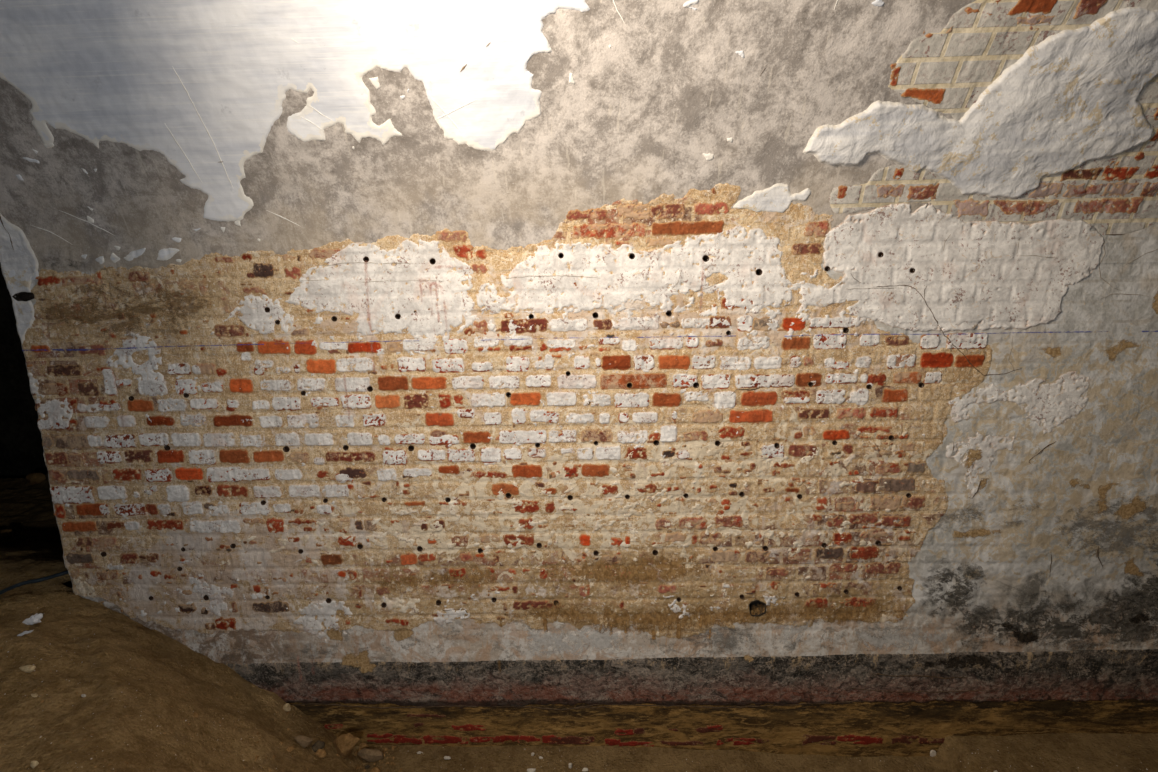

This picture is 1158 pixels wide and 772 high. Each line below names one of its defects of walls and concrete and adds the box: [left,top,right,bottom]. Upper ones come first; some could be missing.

peeling [0,0,1158,274]
flaking render [1044,347,1061,358]
flaking render [1105,340,1139,361]
flaking render [12,183,992,641]
flaking render [1070,479,1146,520]
flaking render [952,528,1001,538]
water stain [499,501,1158,655]